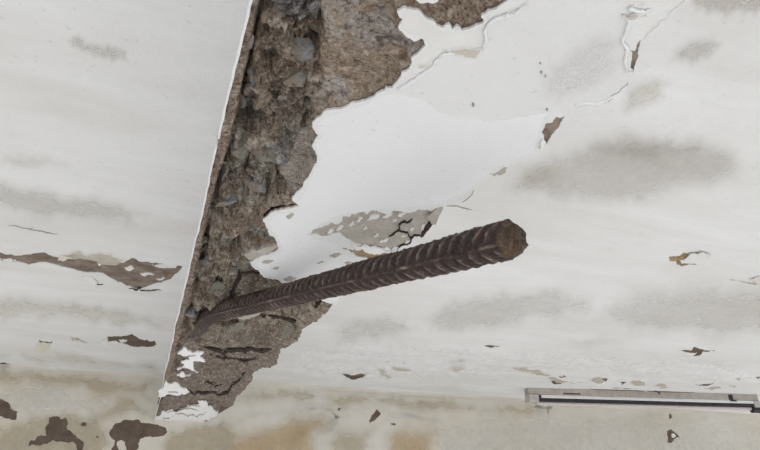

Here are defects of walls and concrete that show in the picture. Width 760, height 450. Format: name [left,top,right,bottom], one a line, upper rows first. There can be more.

peeling [575,6,650,110]
spalling [539,117,563,149]
spalling [0,0,529,450]
crack [389,219,433,250]
peeling [669,252,711,266]
peeling [682,347,715,356]
crack [190,346,272,396]
water stain [0,388,104,409]
water stain [0,415,105,450]
water stain [166,424,234,450]
water stain [442,421,760,450]